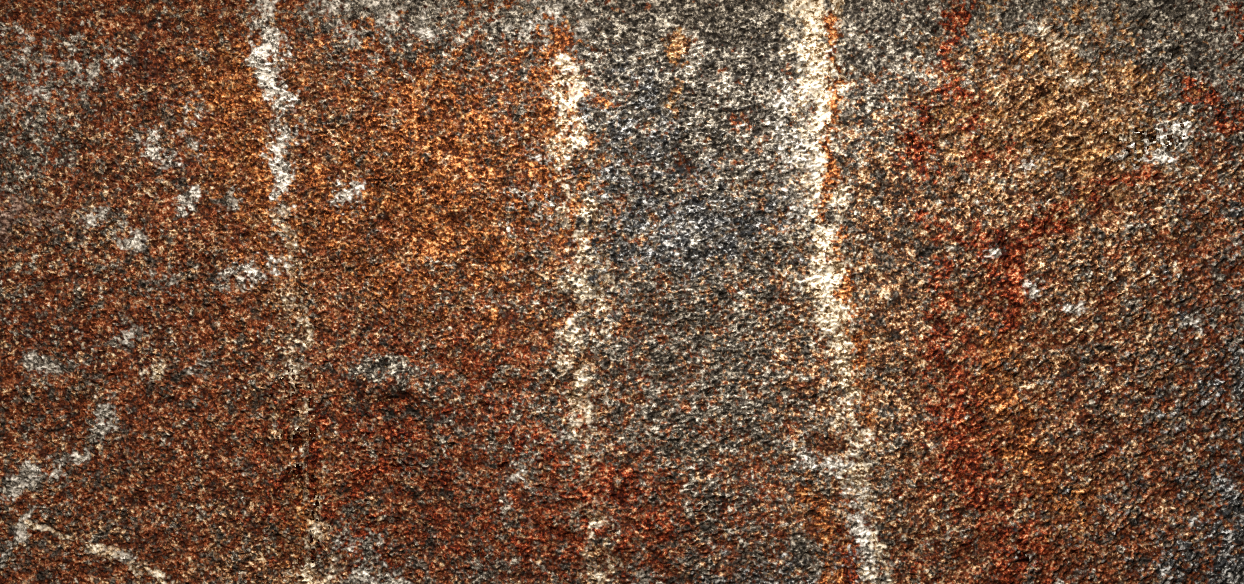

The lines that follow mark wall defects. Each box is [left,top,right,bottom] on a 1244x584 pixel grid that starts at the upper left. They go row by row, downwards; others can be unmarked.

water stain [214,0,344,584]
water stain [330,180,365,215]
rust [169,0,692,584]
water stain [502,0,623,584]
water stain [762,0,892,584]
rust [810,10,848,223]
rust [826,0,1244,584]